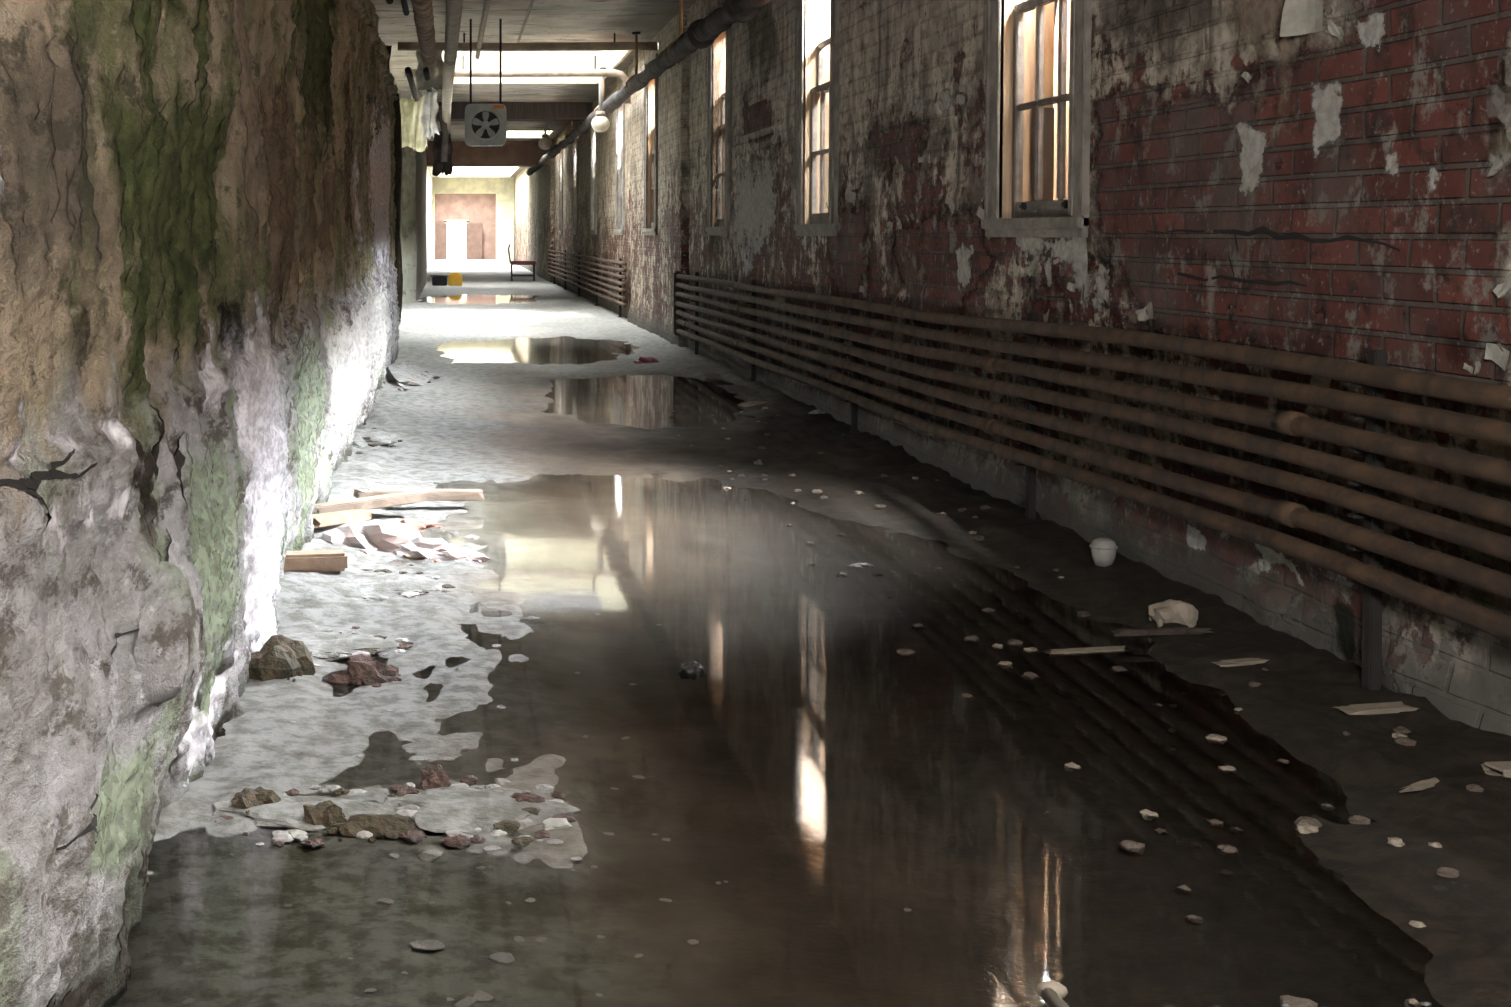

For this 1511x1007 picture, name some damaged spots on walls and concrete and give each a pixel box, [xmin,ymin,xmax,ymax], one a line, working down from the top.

leakage [130,0,160,69]
leakage [192,0,210,98]
peeling [864,84,967,180]
peeling [1016,0,1511,385]
leakage [323,92,394,454]
leakage [129,286,151,395]
leakage [101,421,136,448]
peeling [1422,396,1482,412]
crack [0,449,98,526]
leakage [47,506,66,554]
leakage [81,484,130,527]
leakage [175,252,314,773]